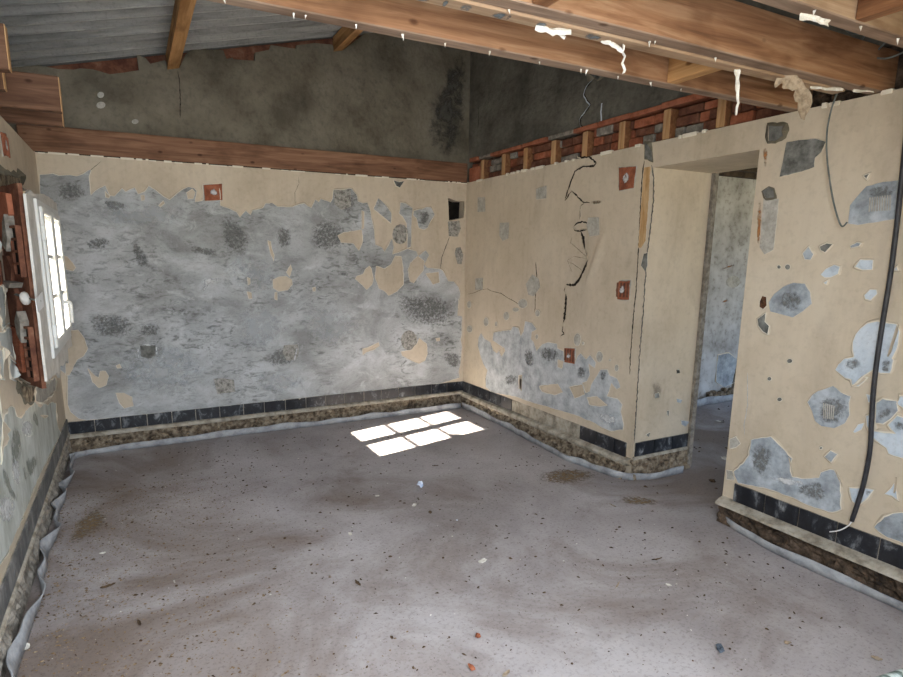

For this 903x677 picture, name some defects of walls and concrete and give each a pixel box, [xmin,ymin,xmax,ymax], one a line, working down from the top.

crack [579,80,602,127]
spalling [765,122,789,144]
spalling [761,186,777,201]
crack [560,156,596,338]
peeling [802,241,834,261]
peeling [849,241,875,271]
spalling [756,312,771,336]
peeling [0,131,690,677]
peeling [835,318,903,459]
peeling [726,435,903,544]
spalling [716,505,903,602]